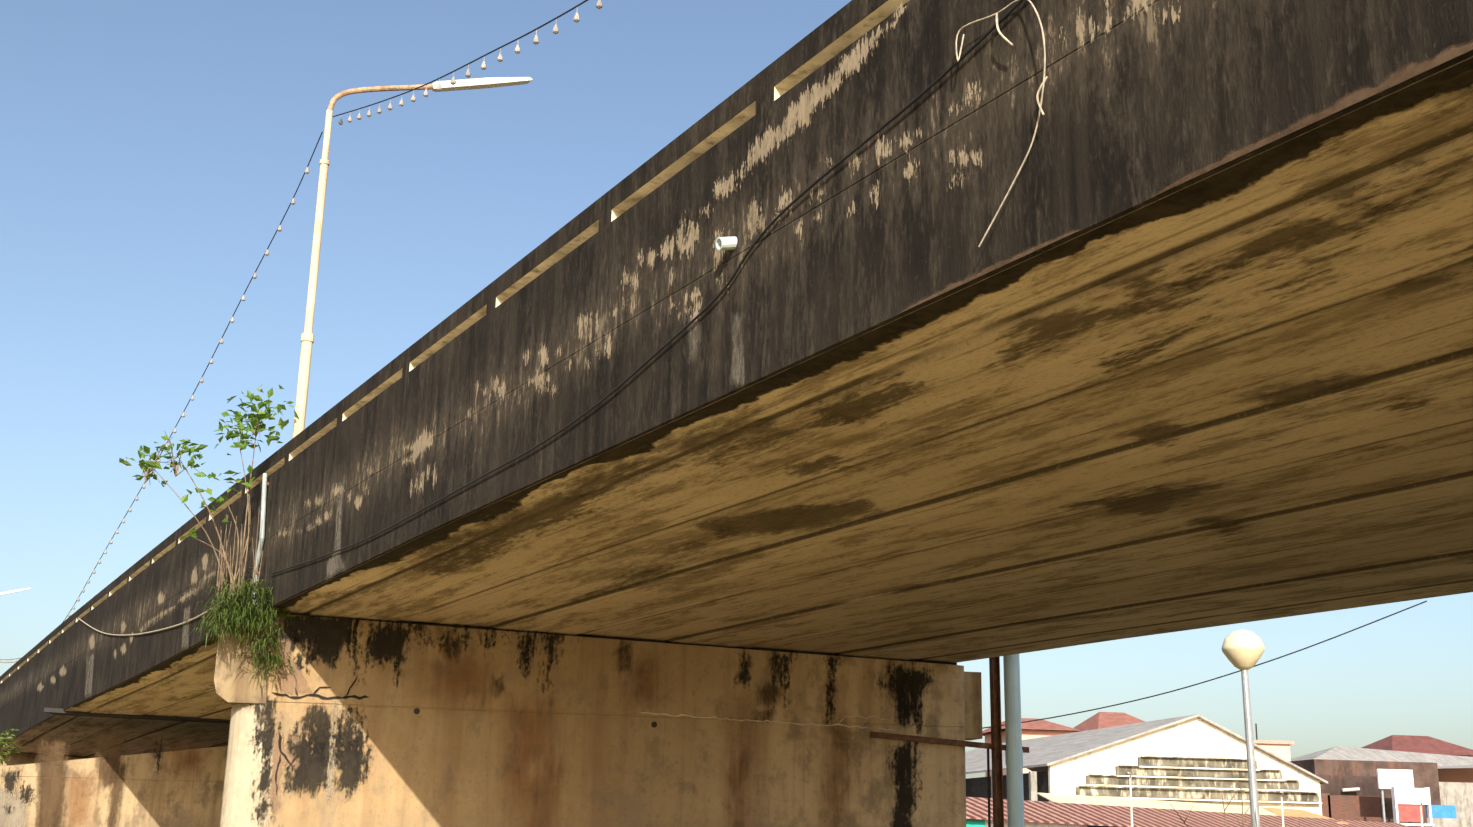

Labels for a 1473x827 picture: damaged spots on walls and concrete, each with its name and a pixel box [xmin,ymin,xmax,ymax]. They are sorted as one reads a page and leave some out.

peeling [1059,0,1181,46]
peeling [523,1,906,398]
peeling [826,128,922,219]
peeling [467,375,506,417]
leakage [272,57,1473,693]
peeling [402,426,437,498]
leakage [735,648,798,720]
leakage [823,653,841,723]
leakage [0,741,67,827]
leakage [97,737,125,827]
leakage [220,696,371,827]
leakage [877,660,934,827]